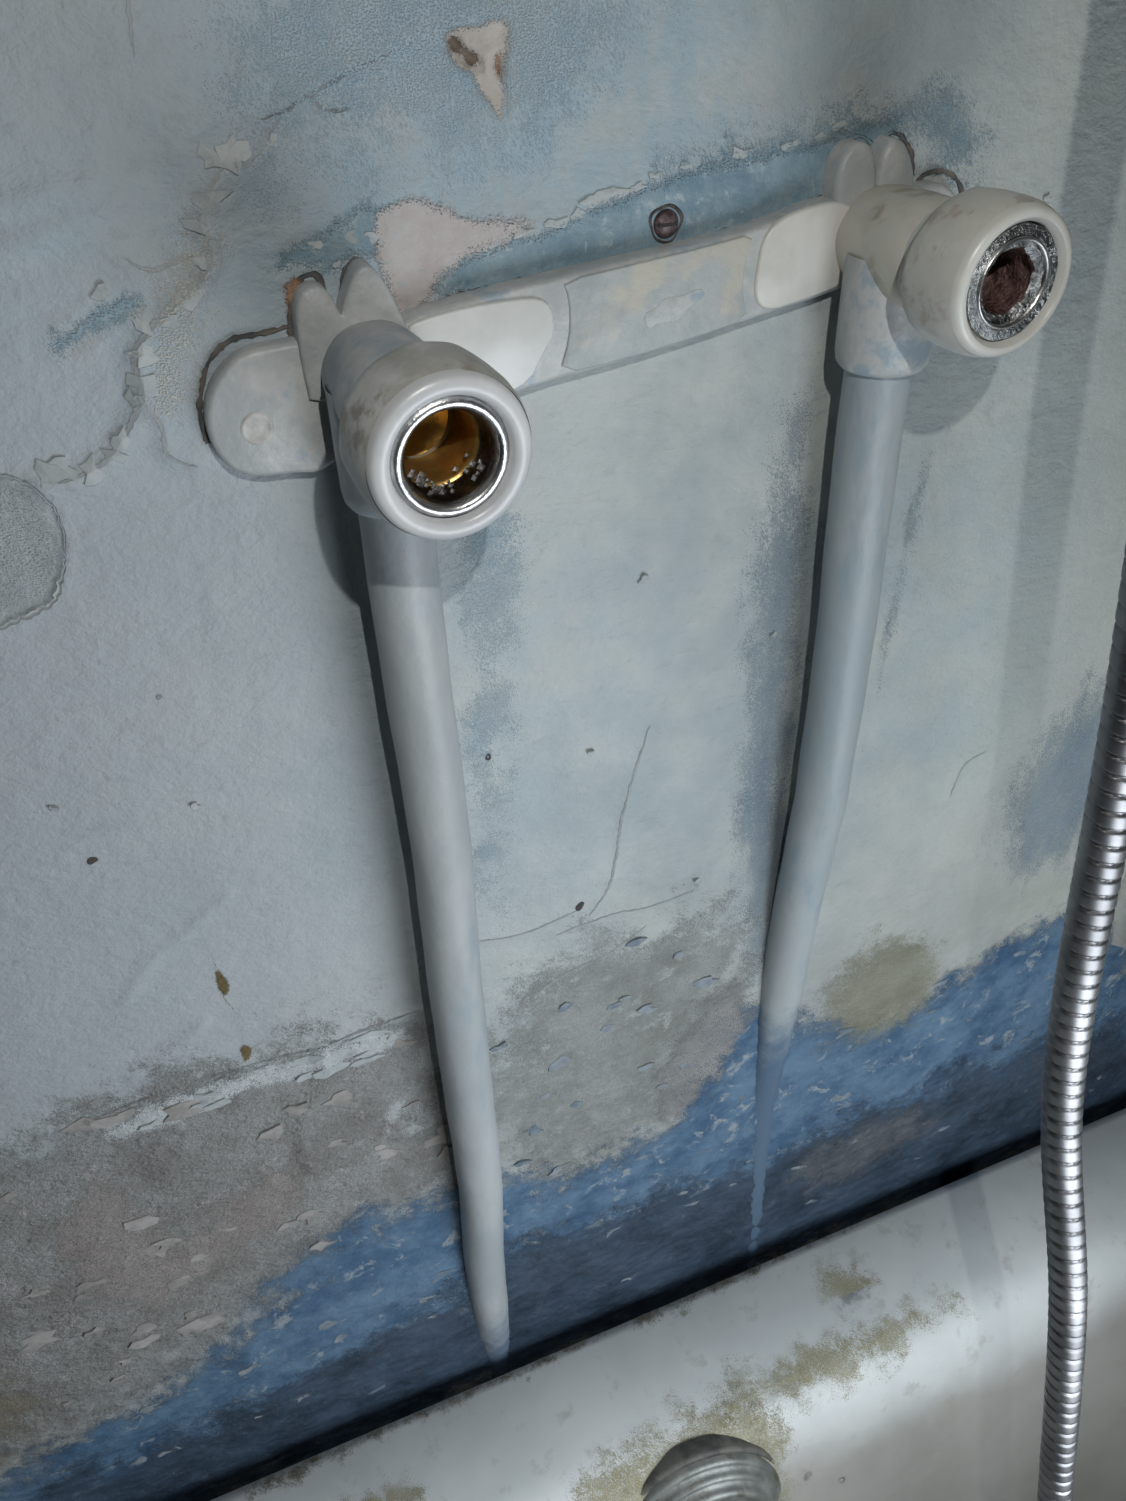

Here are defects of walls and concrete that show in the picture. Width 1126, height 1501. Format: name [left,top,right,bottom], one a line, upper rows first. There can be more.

flaking render [444,19,512,122]
peeling [275,70,996,313]
water stain [212,957,237,1014]
water stain [814,924,946,1049]
water stain [1083,1009,1126,1124]
water stain [10,1028,1046,1501]